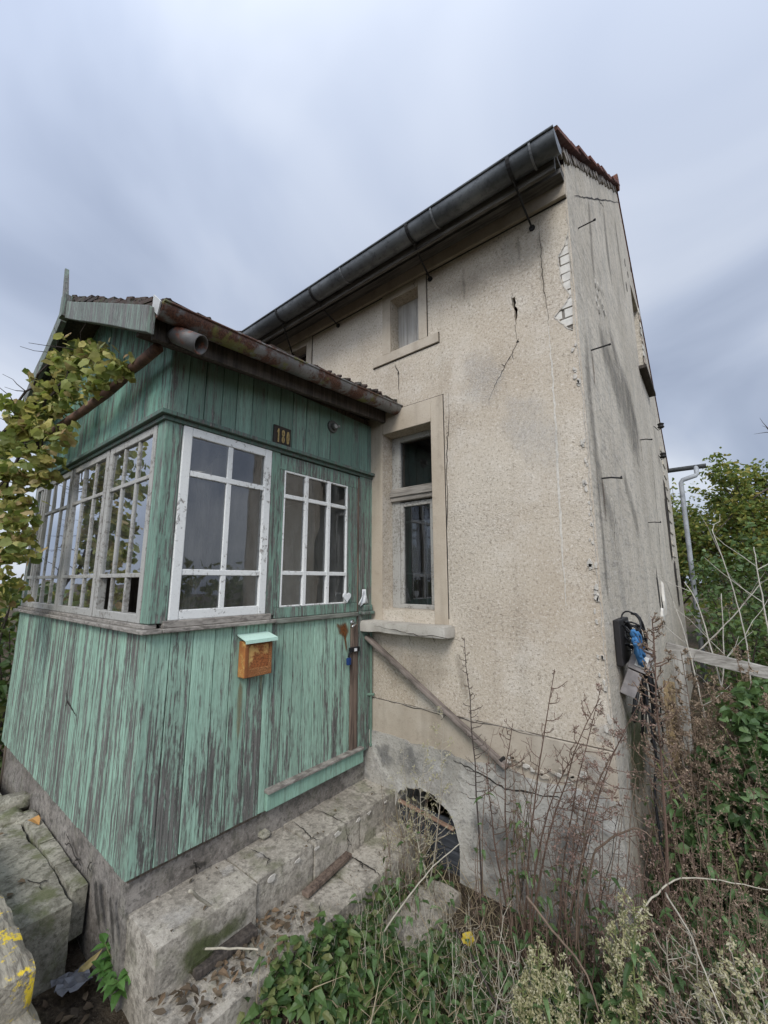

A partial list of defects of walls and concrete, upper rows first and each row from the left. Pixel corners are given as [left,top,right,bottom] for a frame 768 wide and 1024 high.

spalling [554,210,613,751]